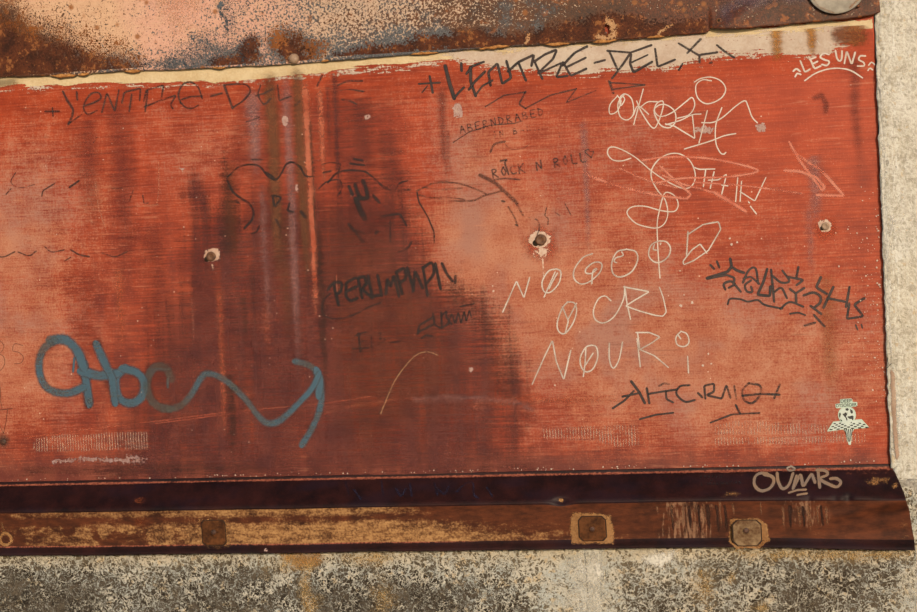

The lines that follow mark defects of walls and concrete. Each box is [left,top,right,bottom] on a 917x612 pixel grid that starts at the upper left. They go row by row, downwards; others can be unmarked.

rust [0,0,148,77]
peeling [0,1,873,92]
rust [207,9,707,66]
rust [687,502,734,532]
rust [782,505,827,527]